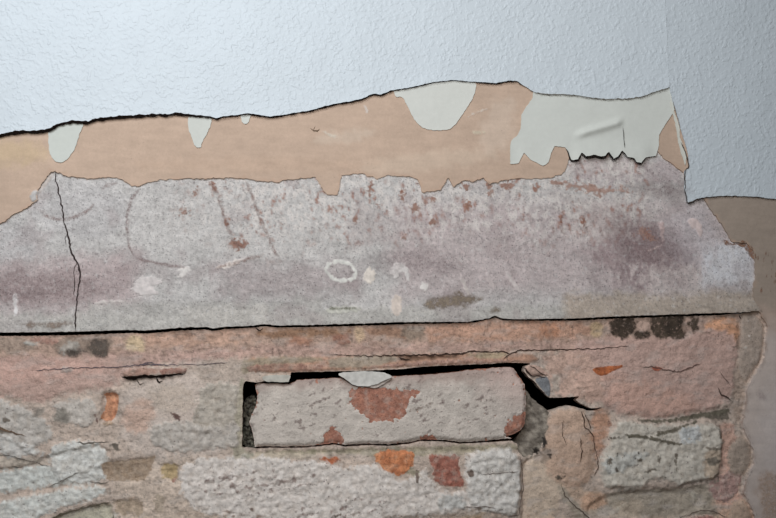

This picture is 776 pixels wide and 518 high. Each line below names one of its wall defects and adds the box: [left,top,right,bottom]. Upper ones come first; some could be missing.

crack [0,171,741,336]
flaking render [0,152,771,518]
crack [0,427,114,518]